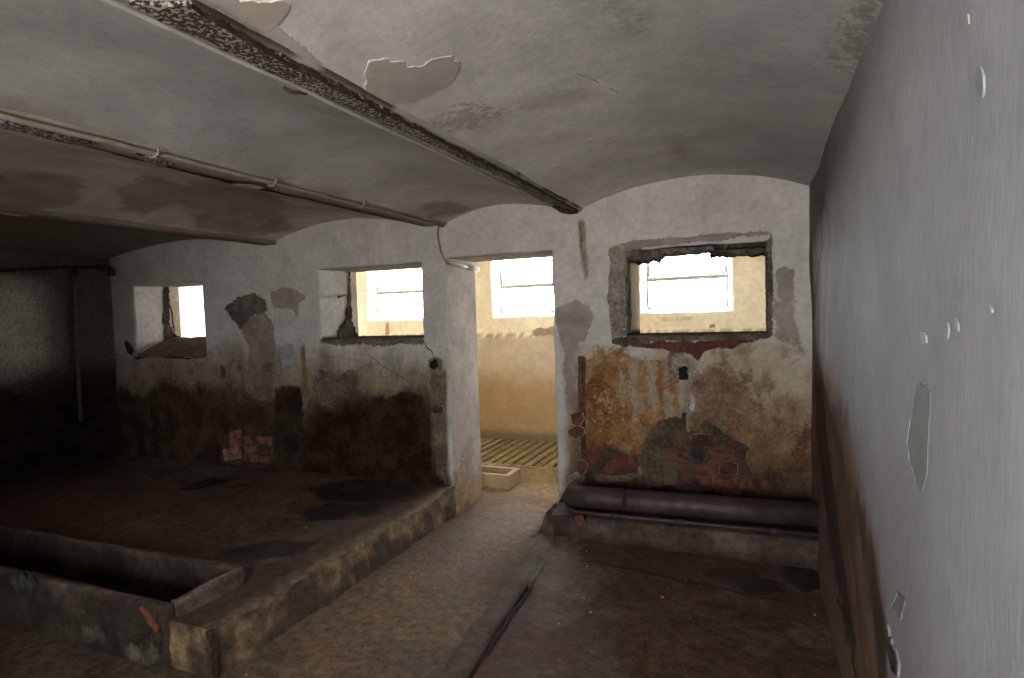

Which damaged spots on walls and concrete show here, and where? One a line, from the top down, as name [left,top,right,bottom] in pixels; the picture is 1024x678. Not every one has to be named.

peeling [198,0,322,66]
peeling [364,55,461,104]
peeling [974,66,986,98]
leakage [0,166,298,242]
spalling [224,292,276,362]
spalling [606,231,774,386]
leakage [0,358,482,523]
flaking render [221,424,278,469]
rust [578,341,812,483]
flaking render [669,430,775,498]
peeling [906,382,931,493]
spalling [883,591,906,678]